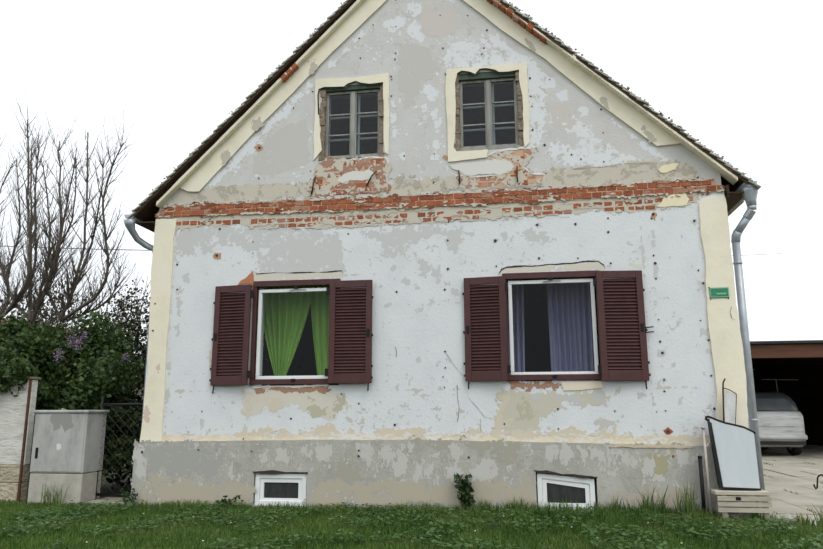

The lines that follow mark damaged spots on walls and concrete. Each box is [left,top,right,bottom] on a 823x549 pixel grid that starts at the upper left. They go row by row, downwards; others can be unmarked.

peeling [155,0,726,285]
flaking render [235,380,697,483]